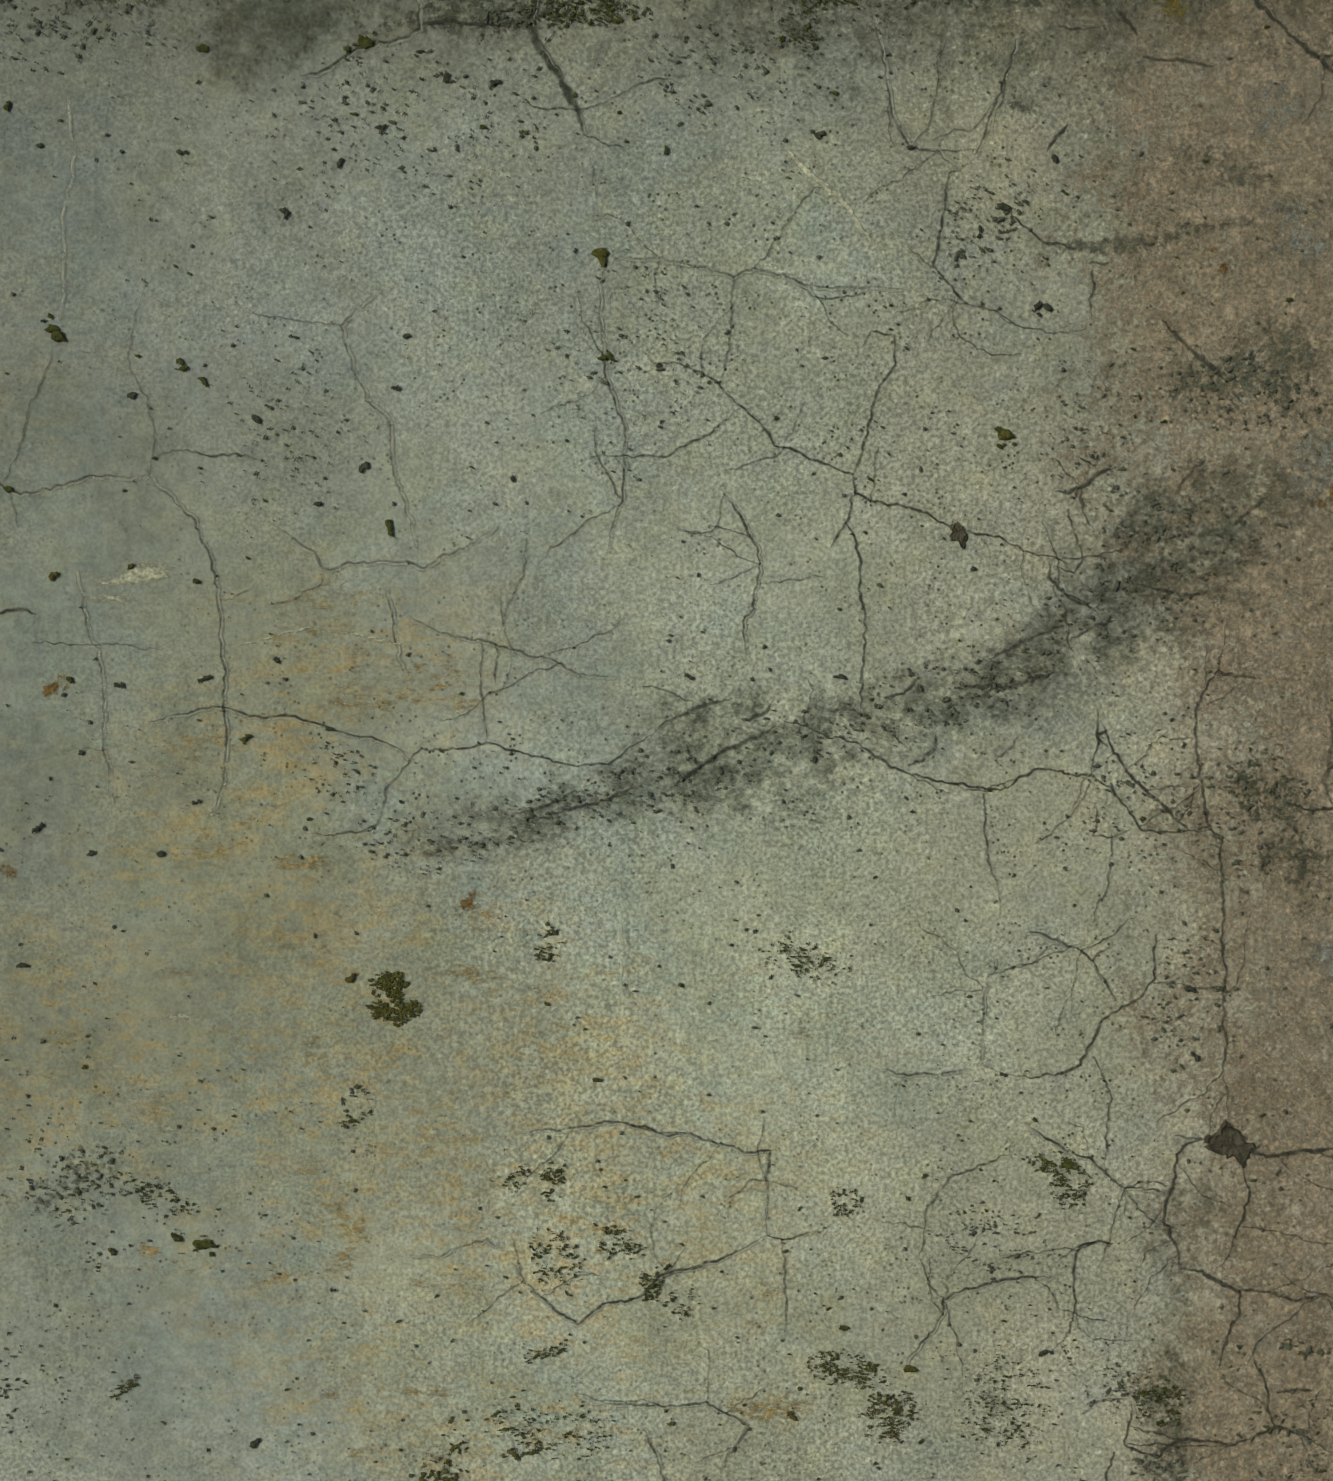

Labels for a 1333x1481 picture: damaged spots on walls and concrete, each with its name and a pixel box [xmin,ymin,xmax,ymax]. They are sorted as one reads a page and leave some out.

crack [1065,11,1207,66]
crack [1255,0,1333,115]
crack [525,0,1134,699]
crack [1161,320,1223,378]
crack [0,423,645,836]
water stain [889,464,1294,765]
water stain [473,696,869,846]
peeling [1065,0,1333,1481]
crack [784,640,1333,1481]
crack [478,1120,803,1325]
crack [592,1389,757,1481]